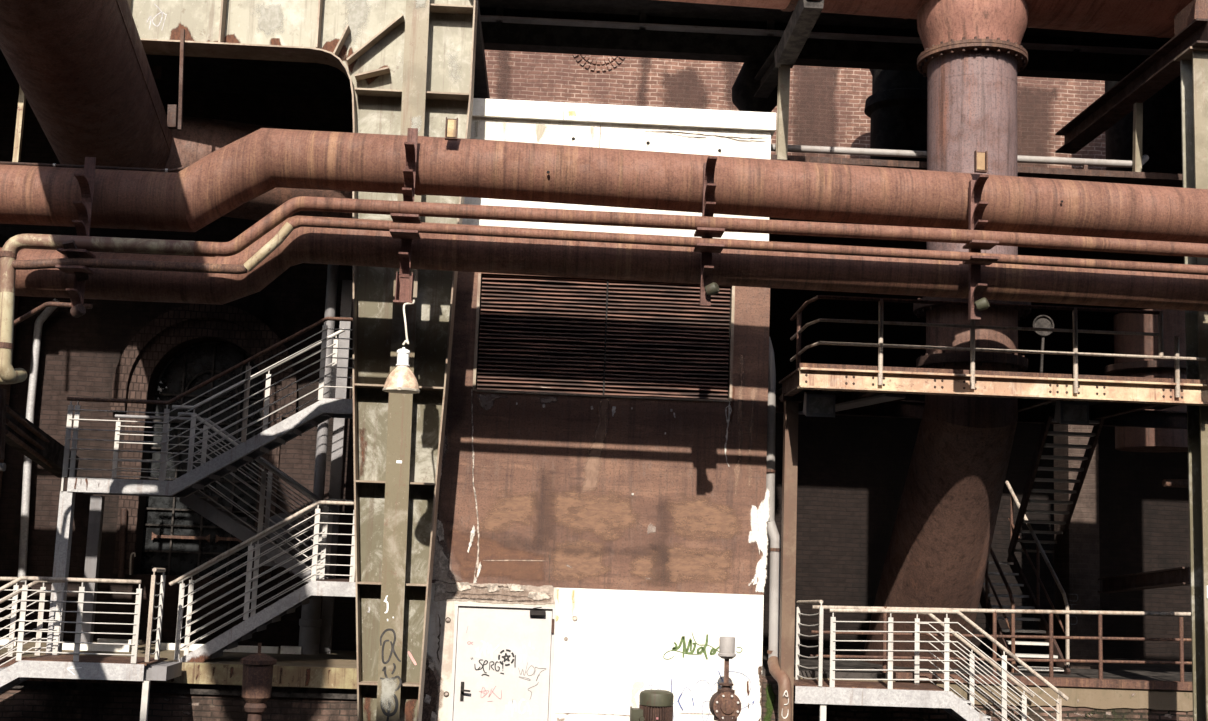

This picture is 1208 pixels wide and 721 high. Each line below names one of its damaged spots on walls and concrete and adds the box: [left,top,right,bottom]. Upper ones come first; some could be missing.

corrosion [170,23,240,43]
corrosion [321,38,357,72]
corrosion [12,196,1208,275]
crack [467,389,550,583]
spalling [432,512,555,605]
peeling [748,490,770,592]